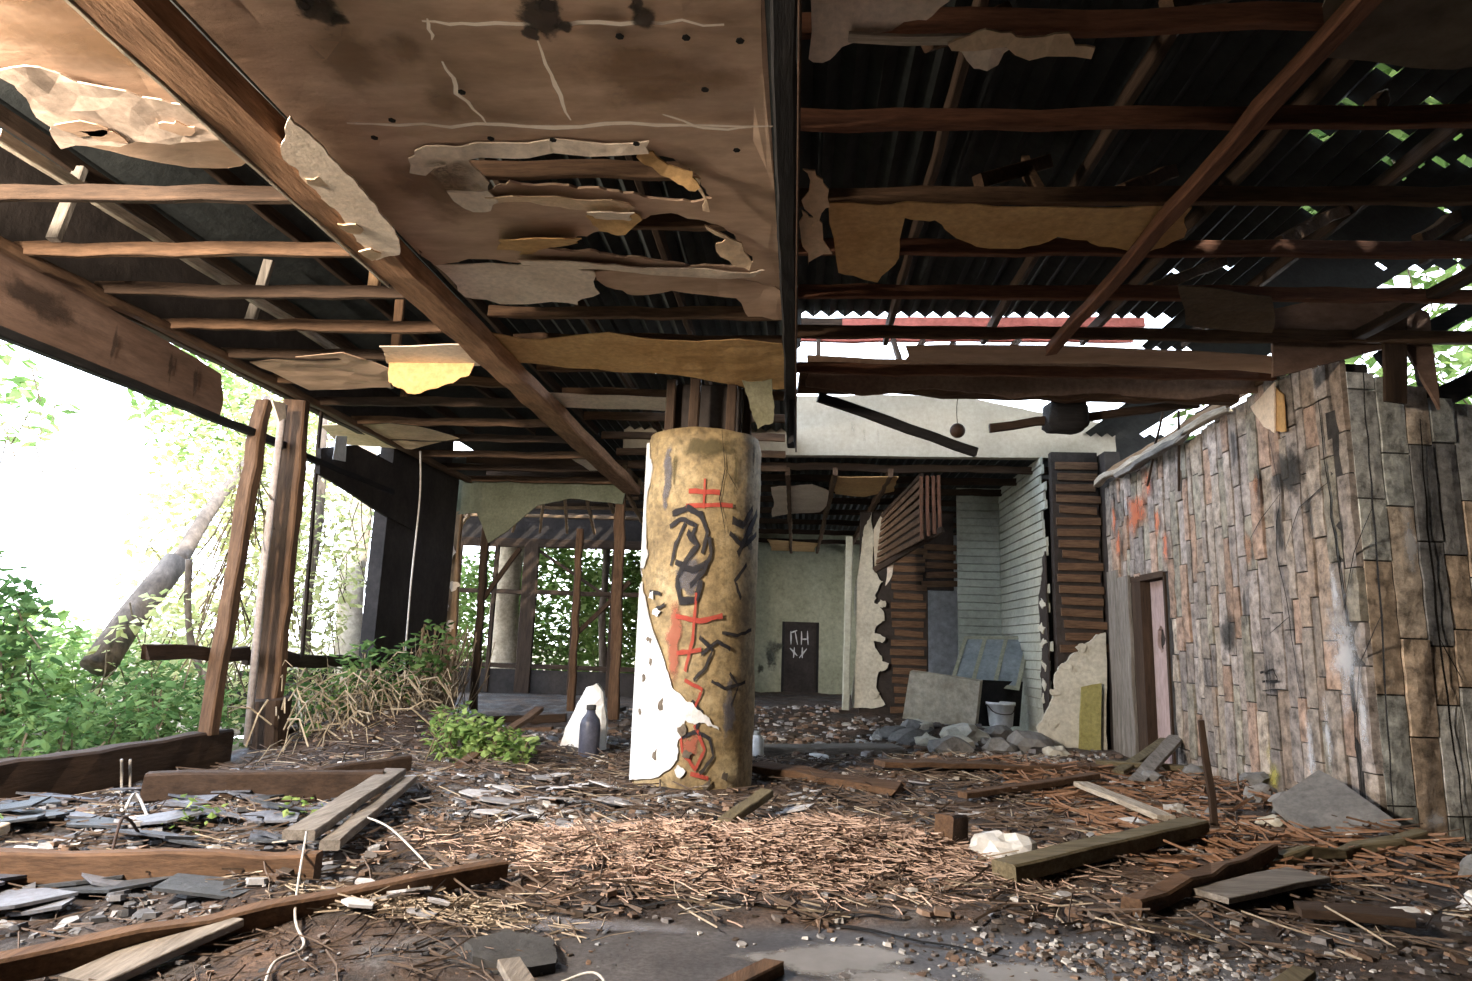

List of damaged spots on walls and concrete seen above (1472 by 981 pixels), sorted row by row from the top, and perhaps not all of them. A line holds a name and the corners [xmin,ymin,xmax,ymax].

peeling [0,65,219,149]
damp [295,0,379,85]
damp [517,0,572,40]
crack [346,18,773,131]
damp [629,0,655,29]
peeling [960,47,1009,71]
peeling [408,138,765,279]
peeling [629,443,719,782]
flaking render [851,512,889,709]
flaking render [1036,551,1107,750]